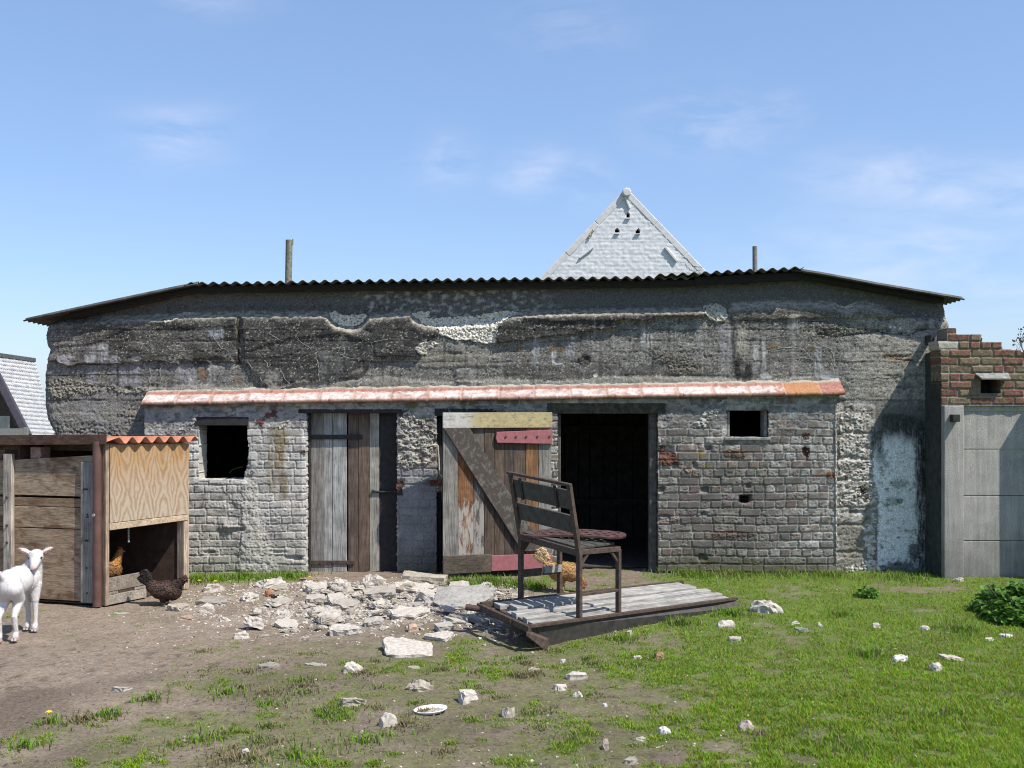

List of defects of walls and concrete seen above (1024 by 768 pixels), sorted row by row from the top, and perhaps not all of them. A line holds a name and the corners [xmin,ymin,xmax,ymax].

spalling [329,311,367,327]
spalling [412,310,518,355]
spalling [703,303,730,323]
spalling [658,445,692,473]
leakage [872,414,926,572]